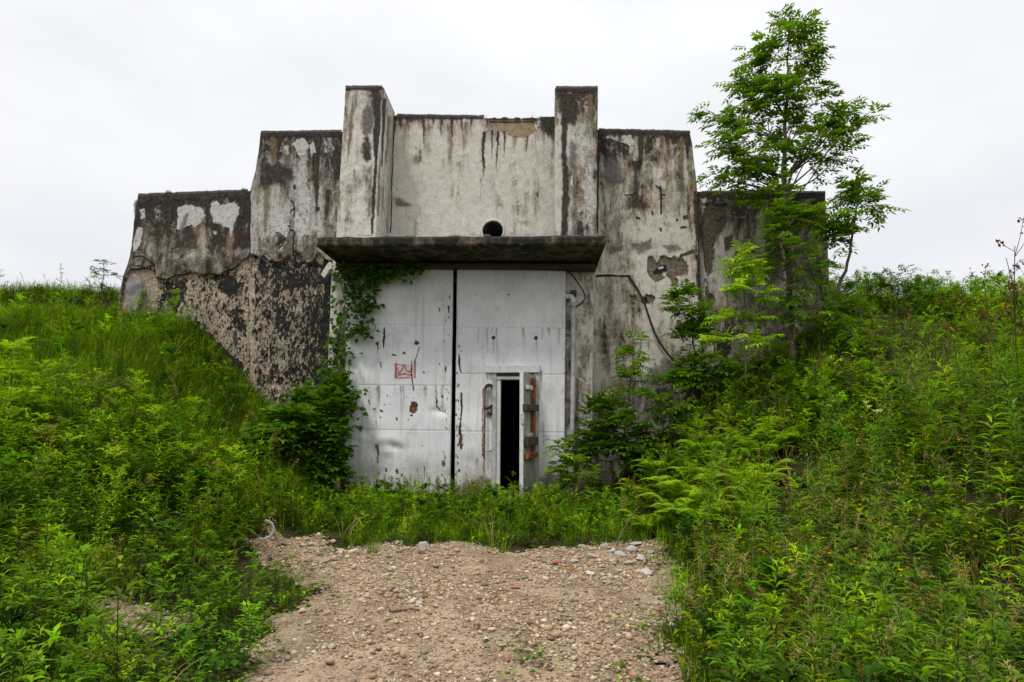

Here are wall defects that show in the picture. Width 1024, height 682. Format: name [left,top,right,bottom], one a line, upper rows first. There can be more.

water stain [134,188,248,250]
spalling [118,138,334,410]
water stain [260,85,528,234]
spalling [487,117,540,139]
water stain [539,86,690,235]
spalling [647,198,740,308]
water stain [693,190,826,316]
corrosion [377,327,425,420]
corrosion [363,345,492,495]